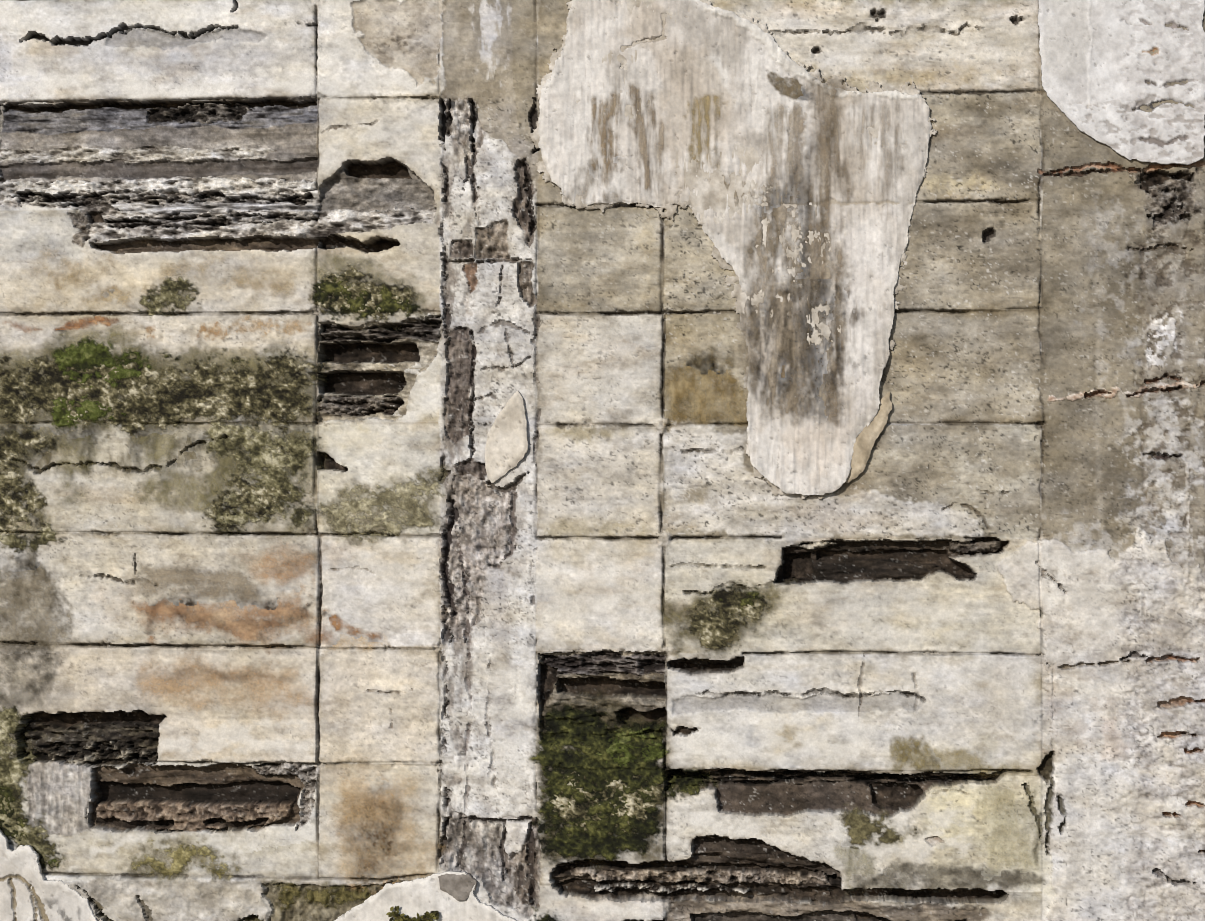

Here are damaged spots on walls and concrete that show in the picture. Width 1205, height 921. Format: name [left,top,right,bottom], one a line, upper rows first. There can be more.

crack [19,0,239,47]
crack [767,21,982,37]
peeling [1009,0,1205,231]
spalling [0,96,437,254]
crack [1037,160,1205,179]
leakage [0,331,313,415]
leakage [0,384,126,498]
leakage [140,433,250,516]
leakage [663,587,779,652]
crack [696,653,926,721]
spalling [14,709,320,837]
spalling [437,811,842,919]